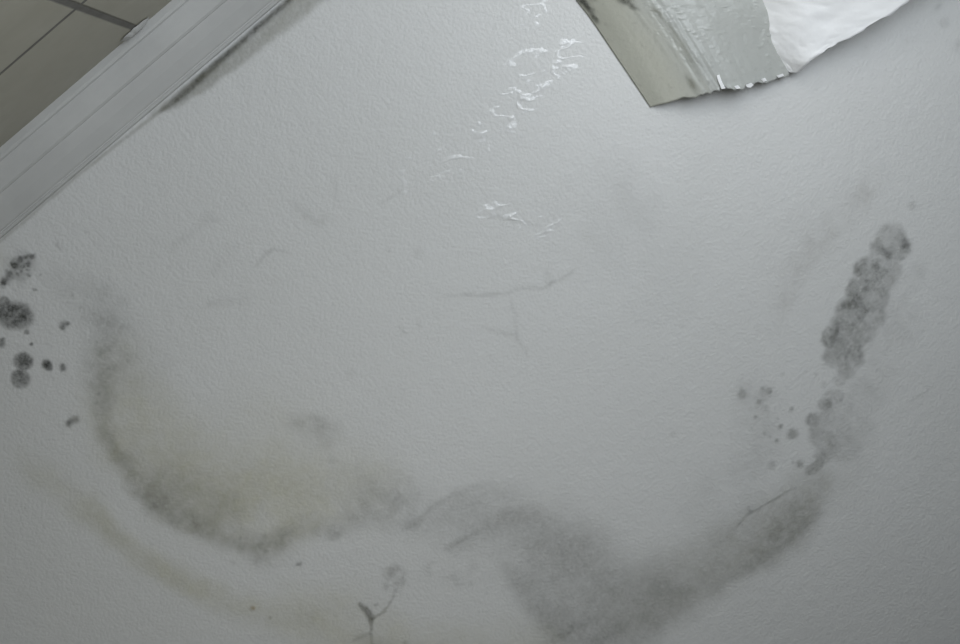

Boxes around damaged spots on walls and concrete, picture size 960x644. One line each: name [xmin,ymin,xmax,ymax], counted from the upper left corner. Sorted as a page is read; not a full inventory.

peeling [577,0,910,107]
water stain [0,303,27,325]